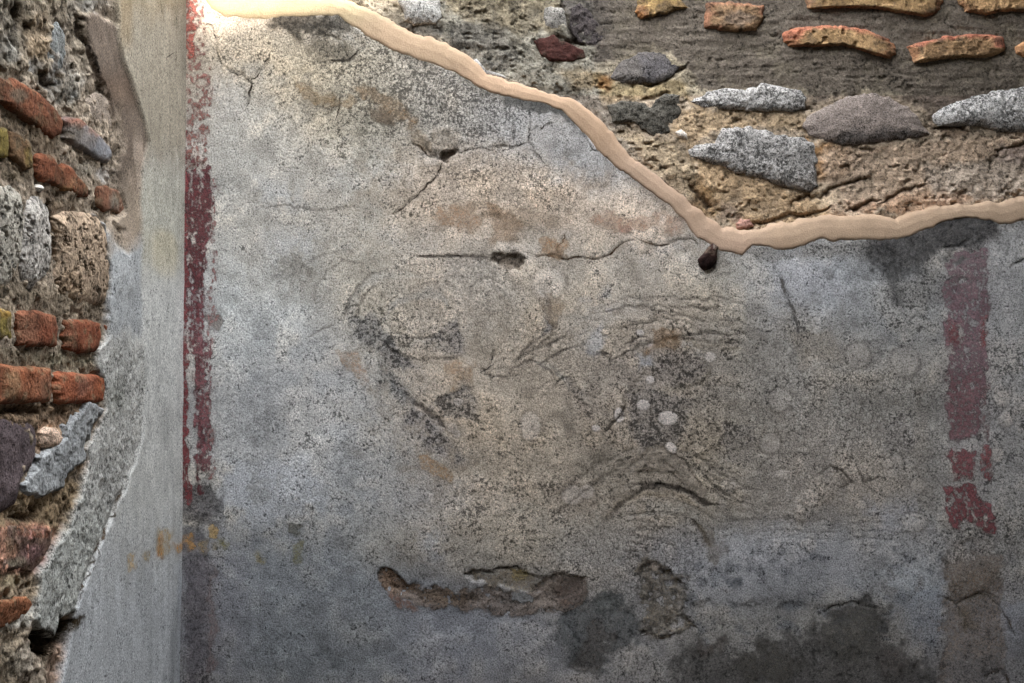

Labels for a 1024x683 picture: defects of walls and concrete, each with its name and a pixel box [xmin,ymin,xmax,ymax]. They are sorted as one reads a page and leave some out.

crack [392,122,548,214]
crack [529,234,698,260]
spalling [378,567,588,618]
damp [549,592,640,673]
spalling [635,555,693,639]
damp [671,593,942,683]